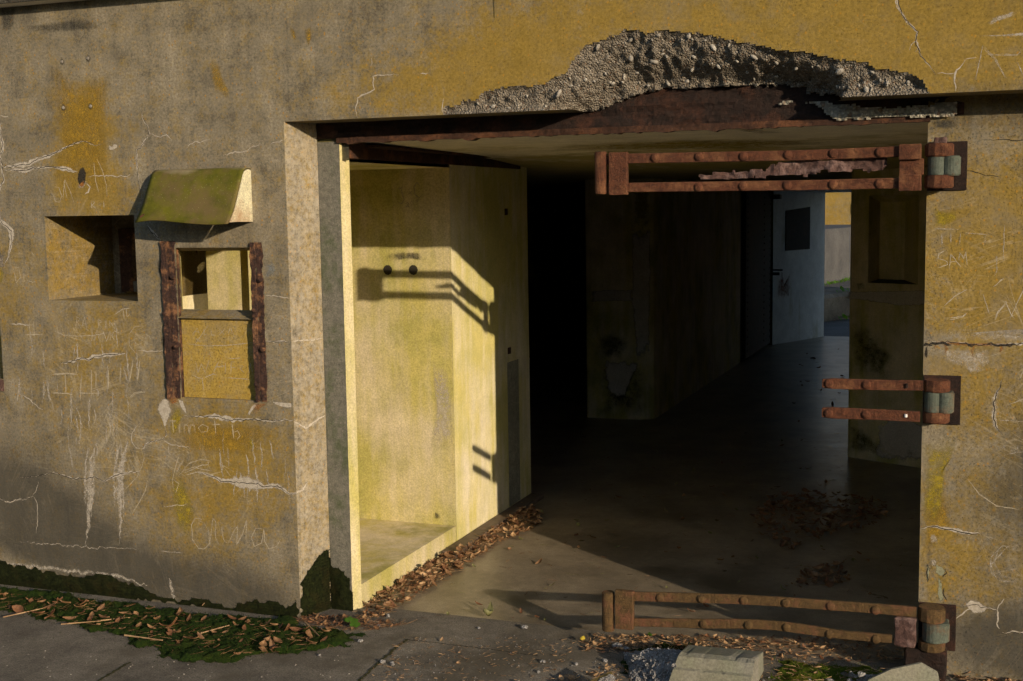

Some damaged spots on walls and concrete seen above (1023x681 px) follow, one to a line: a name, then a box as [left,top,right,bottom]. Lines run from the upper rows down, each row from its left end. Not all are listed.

spalling [443,29,930,115]
crack [0,111,283,241]
rust [699,157,887,180]
crack [0,219,14,264]
crack [926,339,1023,347]
crack [992,372,1023,429]
crack [4,413,325,530]
crack [957,599,1023,634]